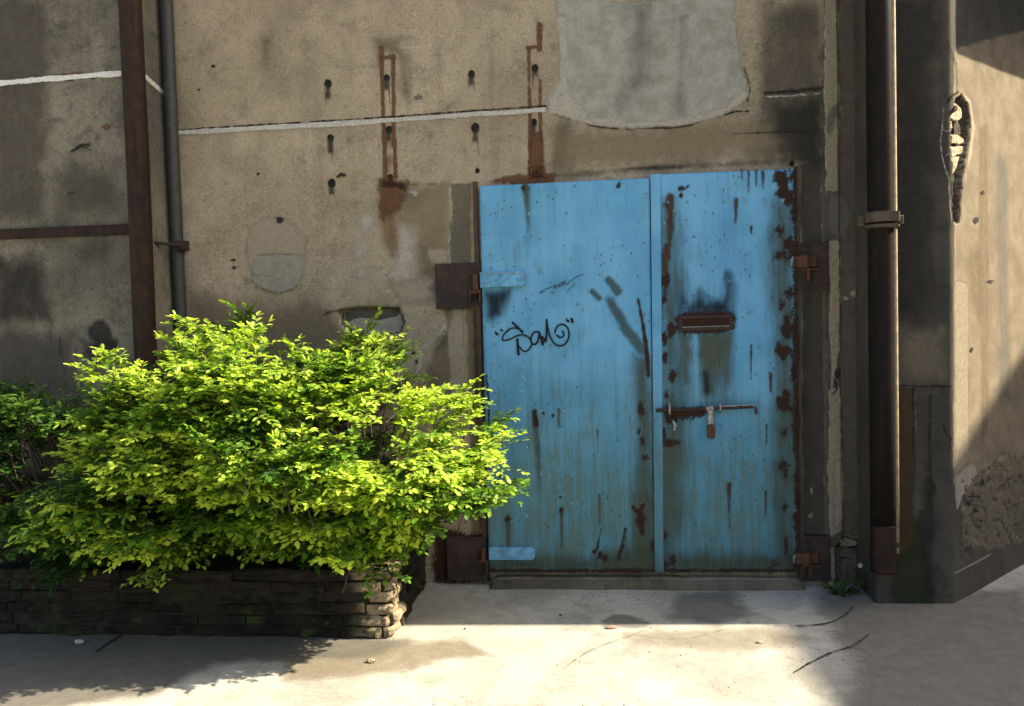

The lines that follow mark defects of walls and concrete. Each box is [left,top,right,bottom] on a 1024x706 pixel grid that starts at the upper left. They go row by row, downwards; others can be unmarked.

rust [377,46,416,249]
rust [490,22,555,220]
spalling [326,307,405,335]
rust [429,168,802,583]
peeling [950,30,1024,551]
crack [775,606,854,626]
crack [793,634,869,673]